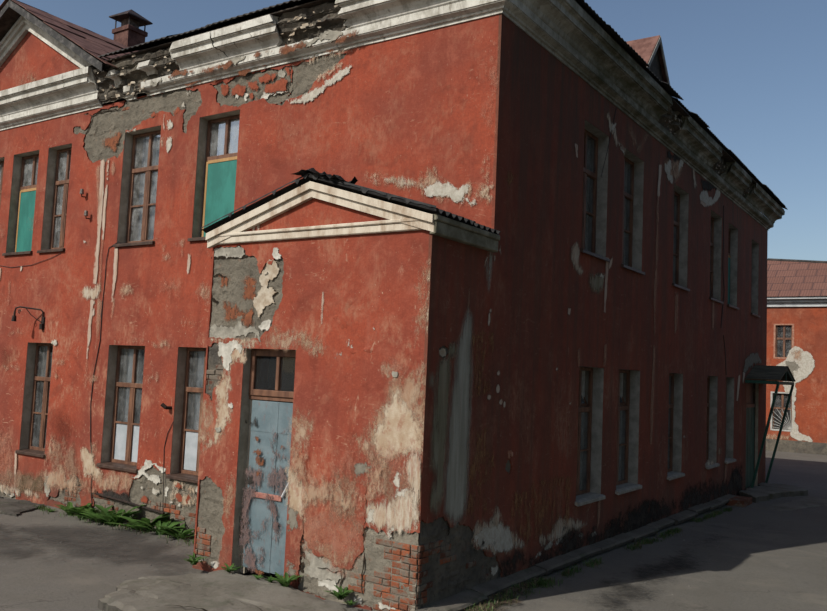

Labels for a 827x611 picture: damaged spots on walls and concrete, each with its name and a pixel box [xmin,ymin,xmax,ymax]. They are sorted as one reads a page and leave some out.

spalling [74,47,202,163]
spalling [213,2,352,107]
leakage [93,160,114,284]
peeling [373,172,493,207]
leakage [86,300,100,359]
spalling [200,246,322,451]
leakage [430,314,472,524]
peeling [766,346,815,442]
spalling [0,437,233,569]
spalling [285,365,524,611]
peeling [535,517,597,559]
leakage [500,464,742,577]